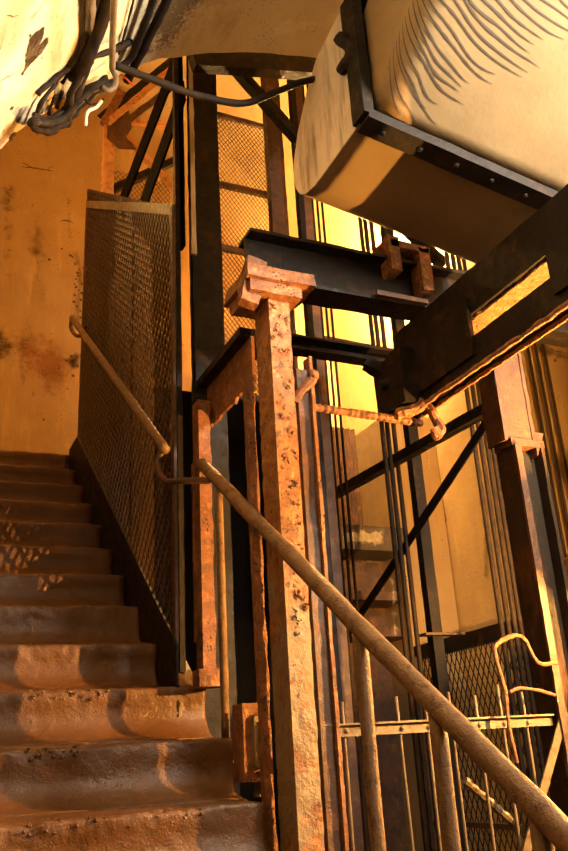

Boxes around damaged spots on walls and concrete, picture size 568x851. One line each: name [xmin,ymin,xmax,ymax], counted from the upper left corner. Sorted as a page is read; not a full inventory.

water stain [0,332,11,358]